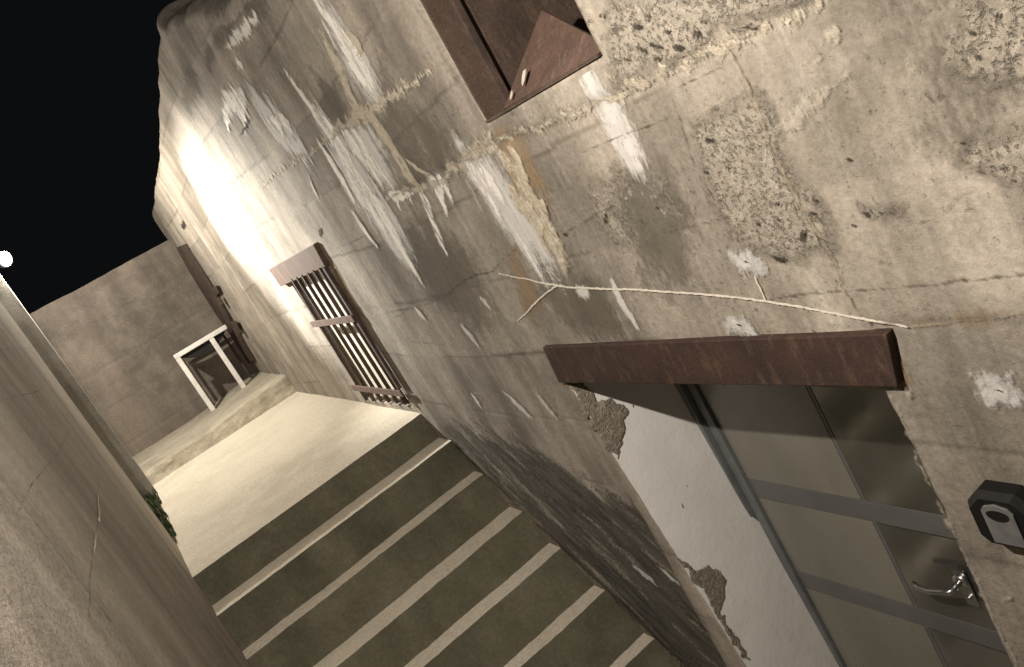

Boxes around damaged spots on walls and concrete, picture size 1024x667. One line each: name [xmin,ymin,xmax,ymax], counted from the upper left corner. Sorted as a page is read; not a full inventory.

damp [206,0,267,64]
spalling [599,0,805,89]
crack [826,25,839,44]
damp [222,96,248,133]
damp [283,0,619,337]
damp [580,70,684,285]
crack [438,46,960,328]
spalling [691,92,835,263]
peeling [569,383,634,459]
peeling [676,557,750,660]